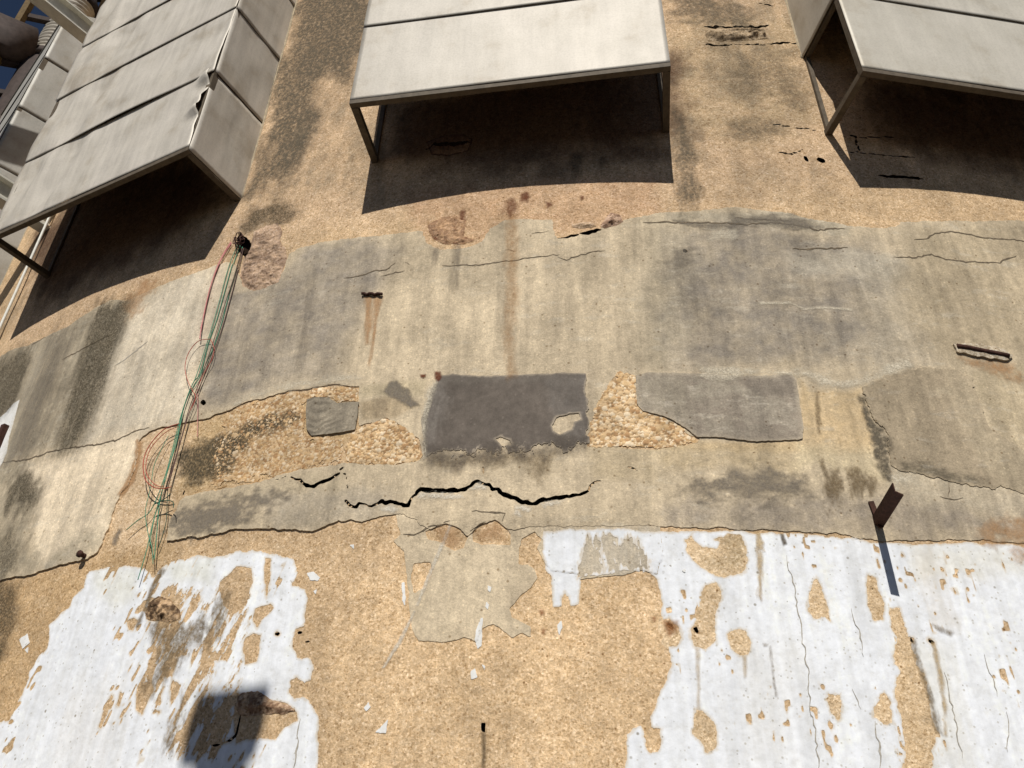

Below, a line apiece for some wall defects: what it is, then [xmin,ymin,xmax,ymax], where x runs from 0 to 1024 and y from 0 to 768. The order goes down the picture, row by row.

spalling [240,222,287,291]
spalling [428,215,474,245]
crack [442,230,605,266]
crack [893,231,1024,263]
spalling [207,386,423,489]
spalling [587,371,698,449]
crack [372,486,547,535]
peeling [0,550,320,768]
peeling [542,528,1024,768]